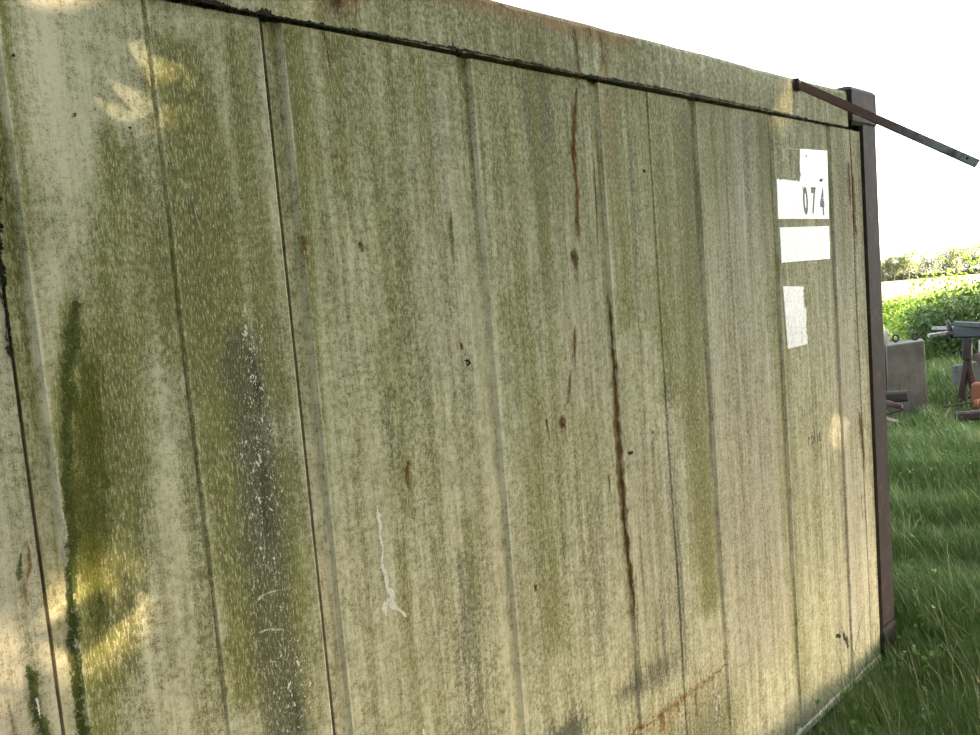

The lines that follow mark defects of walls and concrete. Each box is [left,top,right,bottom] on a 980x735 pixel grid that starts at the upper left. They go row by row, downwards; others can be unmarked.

rust [570,27,581,280]
leakage [65,352,114,638]
rust [607,295,638,624]
rust [638,677,710,731]